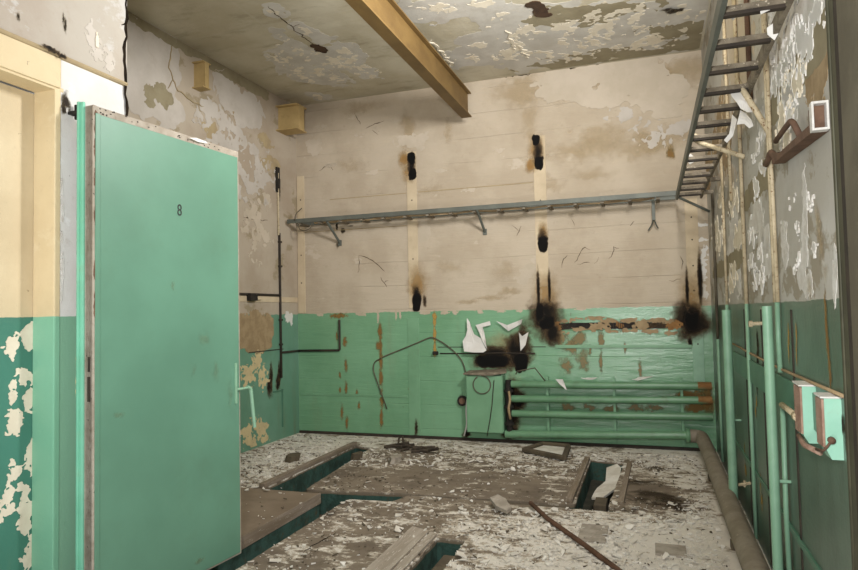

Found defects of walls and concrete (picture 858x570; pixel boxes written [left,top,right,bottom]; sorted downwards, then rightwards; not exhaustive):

peeling [84,18,116,73]
peeling [261,3,384,100]
peeling [398,0,709,151]
peeling [126,12,281,268]
peeling [698,0,828,304]
peeling [0,321,33,437]
peeling [240,415,270,449]
rust [376,324,384,426]
peeling [559,316,678,336]
peeling [0,439,32,570]